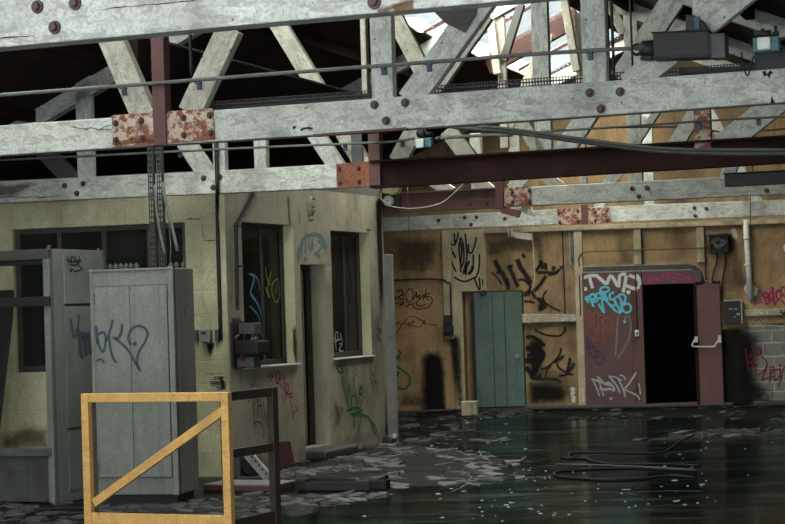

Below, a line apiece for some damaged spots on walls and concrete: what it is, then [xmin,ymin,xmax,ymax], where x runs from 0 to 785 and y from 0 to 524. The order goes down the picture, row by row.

spalling [741,325,785,400]